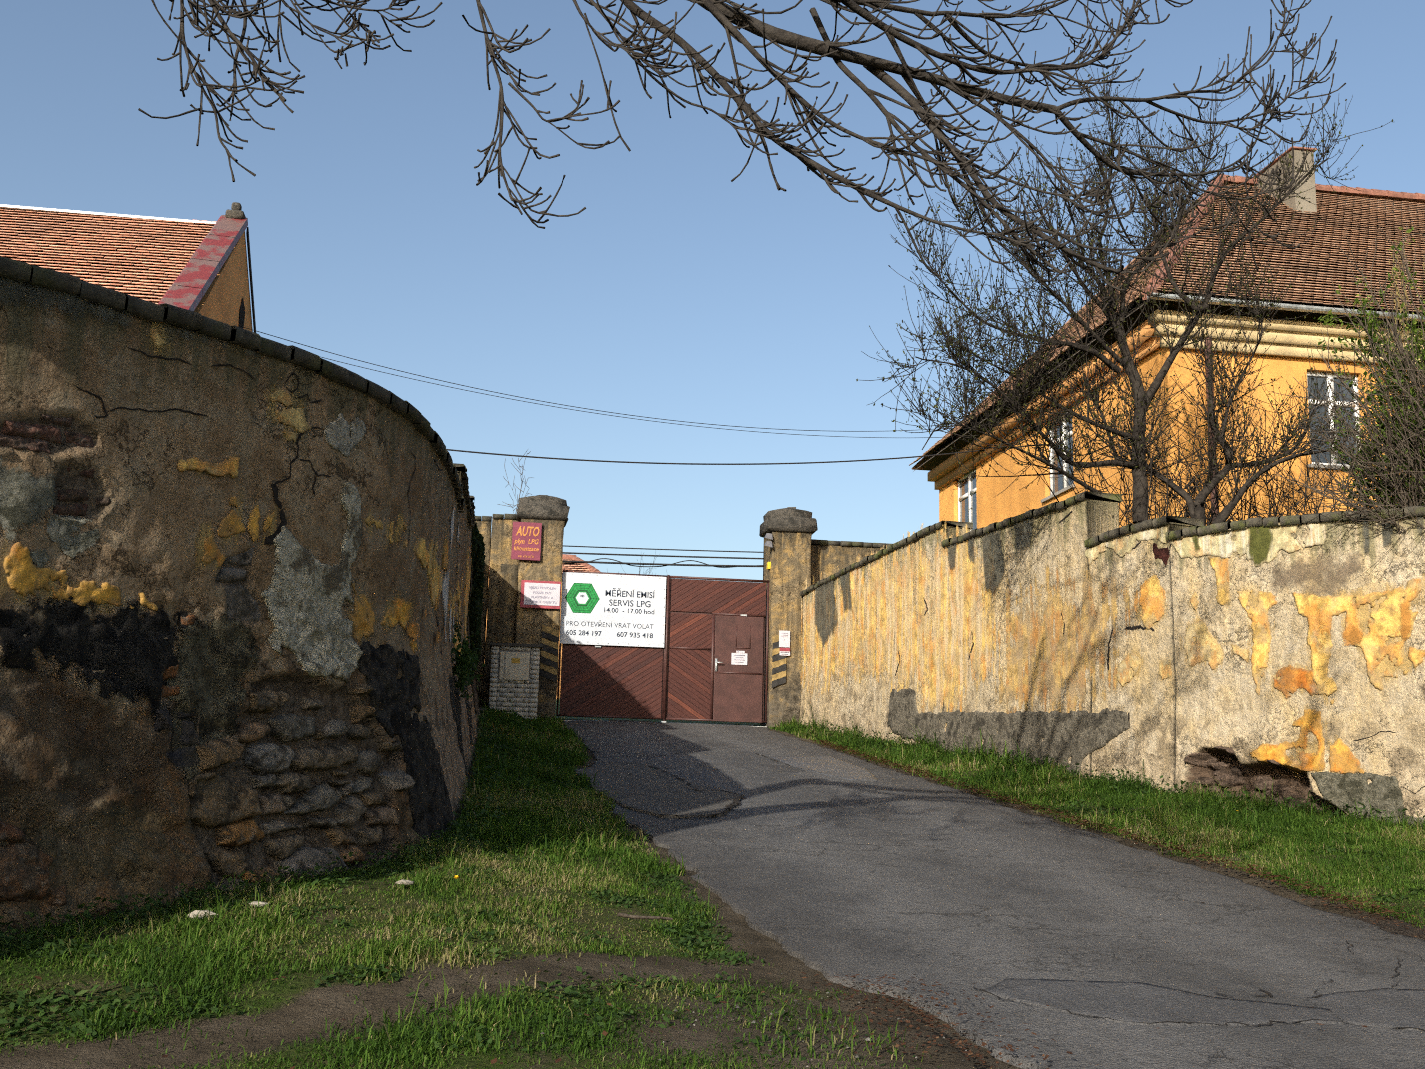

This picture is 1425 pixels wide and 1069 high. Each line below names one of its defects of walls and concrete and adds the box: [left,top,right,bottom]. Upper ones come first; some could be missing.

crack [74,385,206,418]
peeling [177,457,240,478]
crack [128,347,331,545]
peeling [3,542,158,611]
flaking render [178,615,195,625]
flaking render [195,497,275,622]
peeling [348,582,418,653]
peeling [1085,523,1425,816]
flaking render [188,684,415,891]
crack [973,940,1424,1030]